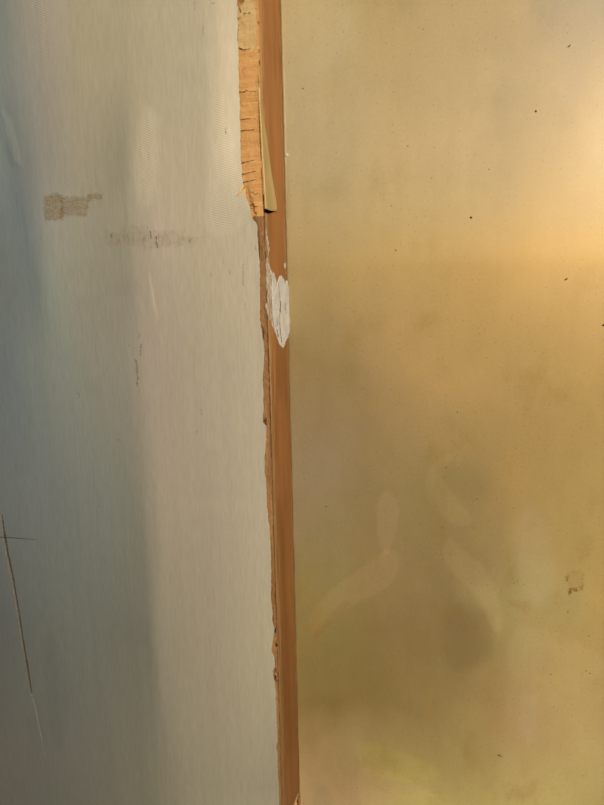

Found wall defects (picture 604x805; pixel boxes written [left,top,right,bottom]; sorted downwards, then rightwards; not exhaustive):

spalling [237,0,265,217]